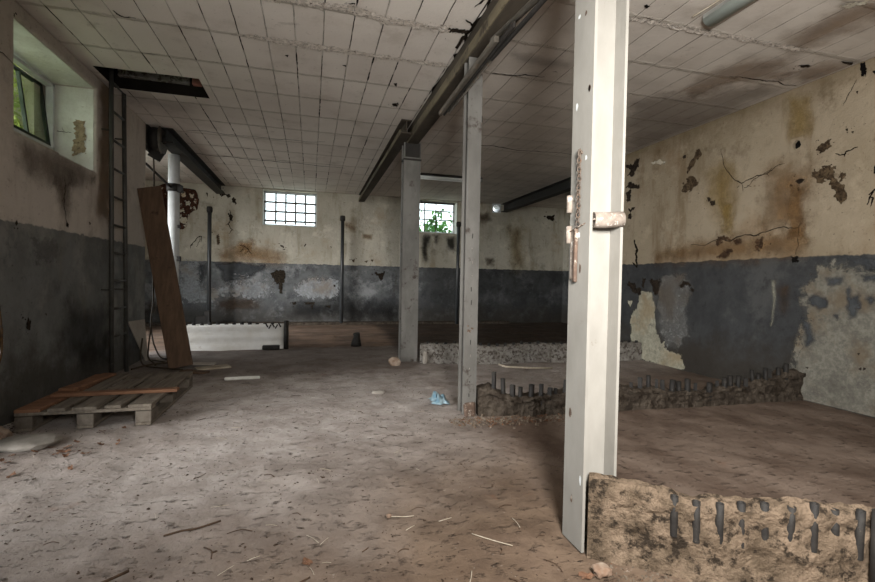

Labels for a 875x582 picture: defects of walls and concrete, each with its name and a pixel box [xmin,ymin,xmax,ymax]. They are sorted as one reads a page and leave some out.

crack [432,0,491,92]
spalling [72,119,86,156]
spalling [179,188,237,229]
spalling [625,158,640,219]
spalling [682,149,715,206]
crack [721,153,785,188]
spalling [790,136,857,204]
crack [867,166,875,206]
crack [691,225,800,254]
peeling [179,259,340,309]
peeling [627,274,694,369]
peeling [790,258,875,417]